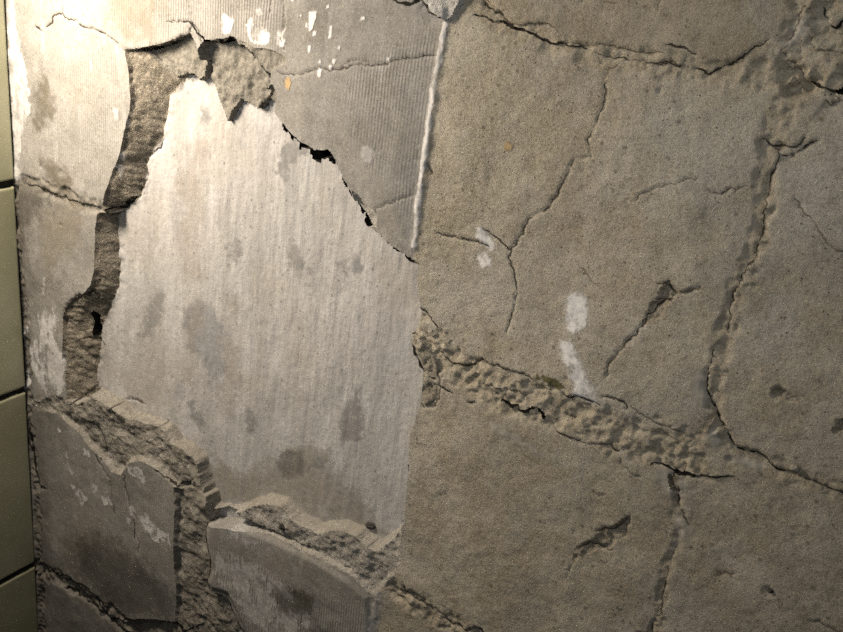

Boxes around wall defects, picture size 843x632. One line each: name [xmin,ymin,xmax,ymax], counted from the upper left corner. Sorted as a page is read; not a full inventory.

crack [394,0,441,19]
crack [35,1,433,109]
crack [23,139,164,213]
crack [282,123,416,263]
crack [439,0,843,332]
spalling [27,14,423,632]
crack [607,282,701,371]
crack [411,344,843,525]
crack [48,569,205,632]
crack [403,585,483,632]
crack [565,516,630,578]
crack [651,546,677,631]